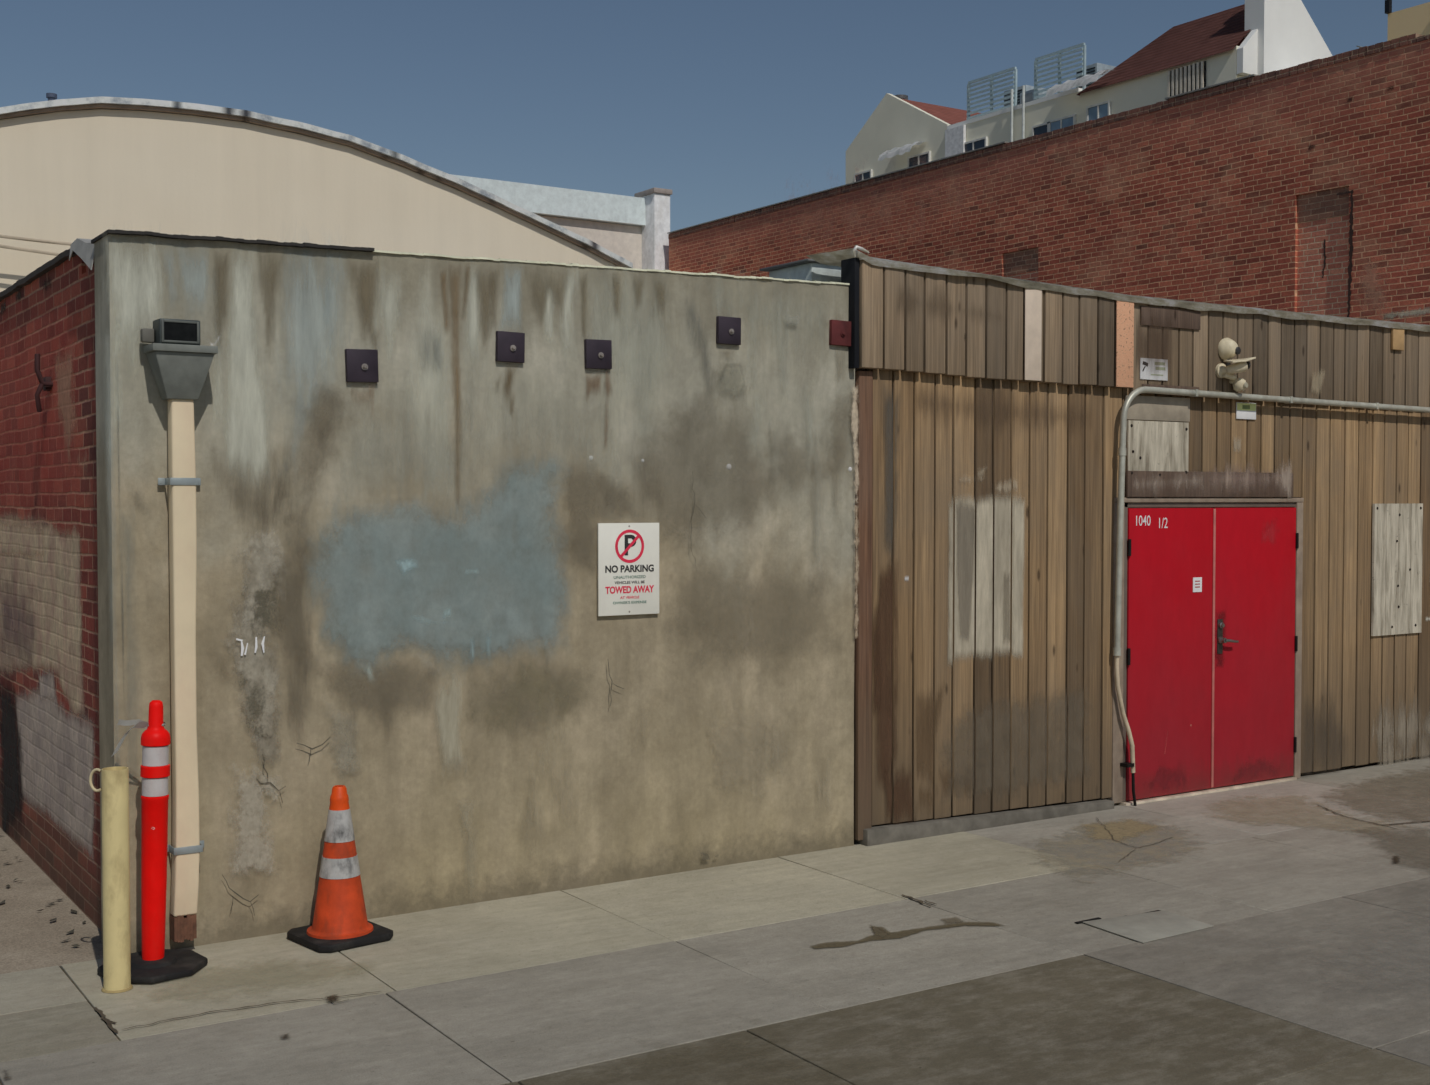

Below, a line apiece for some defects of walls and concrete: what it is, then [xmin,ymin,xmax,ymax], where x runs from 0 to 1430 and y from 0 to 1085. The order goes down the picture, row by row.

leakage [111,244,162,369]
leakage [360,269,395,334]
leakage [185,259,276,479]
leakage [442,272,586,422]
peeling [39,673,54,700]
crack [256,754,286,803]
crack [222,875,258,916]